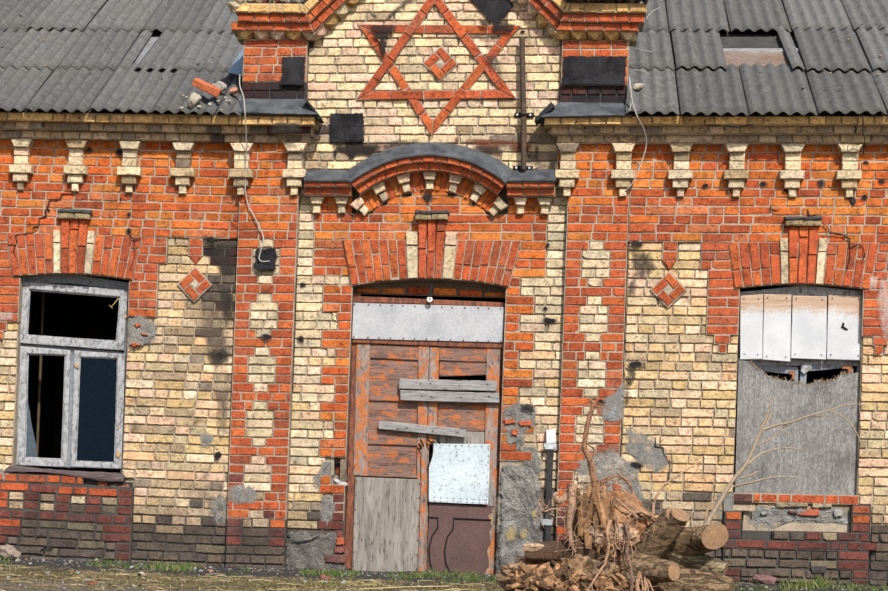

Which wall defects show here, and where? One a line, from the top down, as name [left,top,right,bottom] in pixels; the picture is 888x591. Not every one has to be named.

crack [13,193,72,262]
leakage [204,287,235,353]